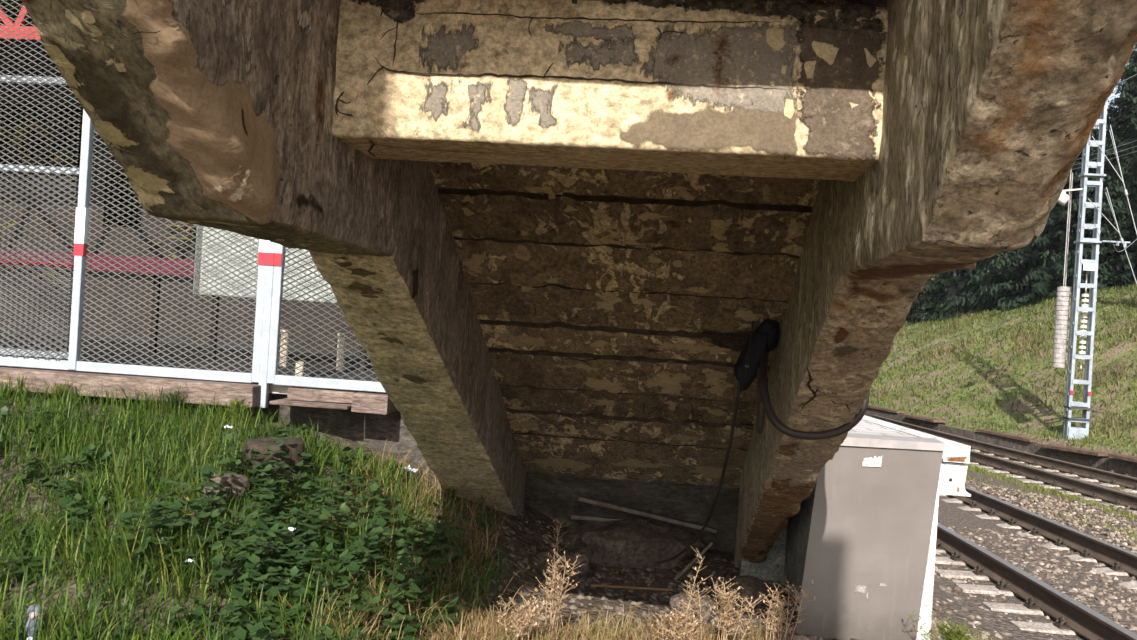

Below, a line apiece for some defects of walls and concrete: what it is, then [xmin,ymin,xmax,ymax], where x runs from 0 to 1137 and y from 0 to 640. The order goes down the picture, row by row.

peeling [40,38,139,147]
peeling [352,0,491,131]
peeling [504,77,557,128]
crack [335,4,790,117]
peeling [544,0,887,164]
peeling [117,161,175,194]
crack [368,139,535,158]
peeling [556,363,627,410]
crack [498,348,724,368]
peeling [643,369,746,436]
crack [799,368,850,411]
spalling [740,477,818,563]